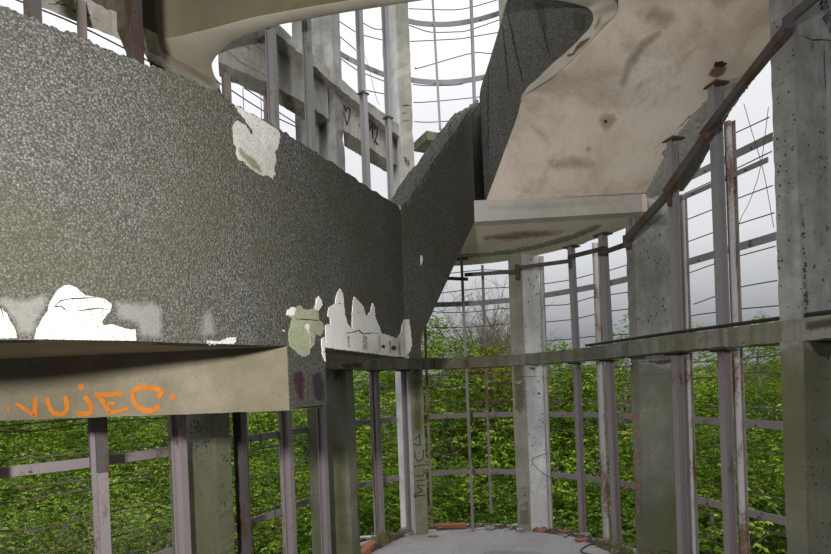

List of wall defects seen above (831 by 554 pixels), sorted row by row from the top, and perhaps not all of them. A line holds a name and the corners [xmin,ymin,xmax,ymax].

flaking render [232,105,280,179]
flaking render [0,307,17,339]
flaking render [34,285,136,341]
flaking render [282,289,412,361]